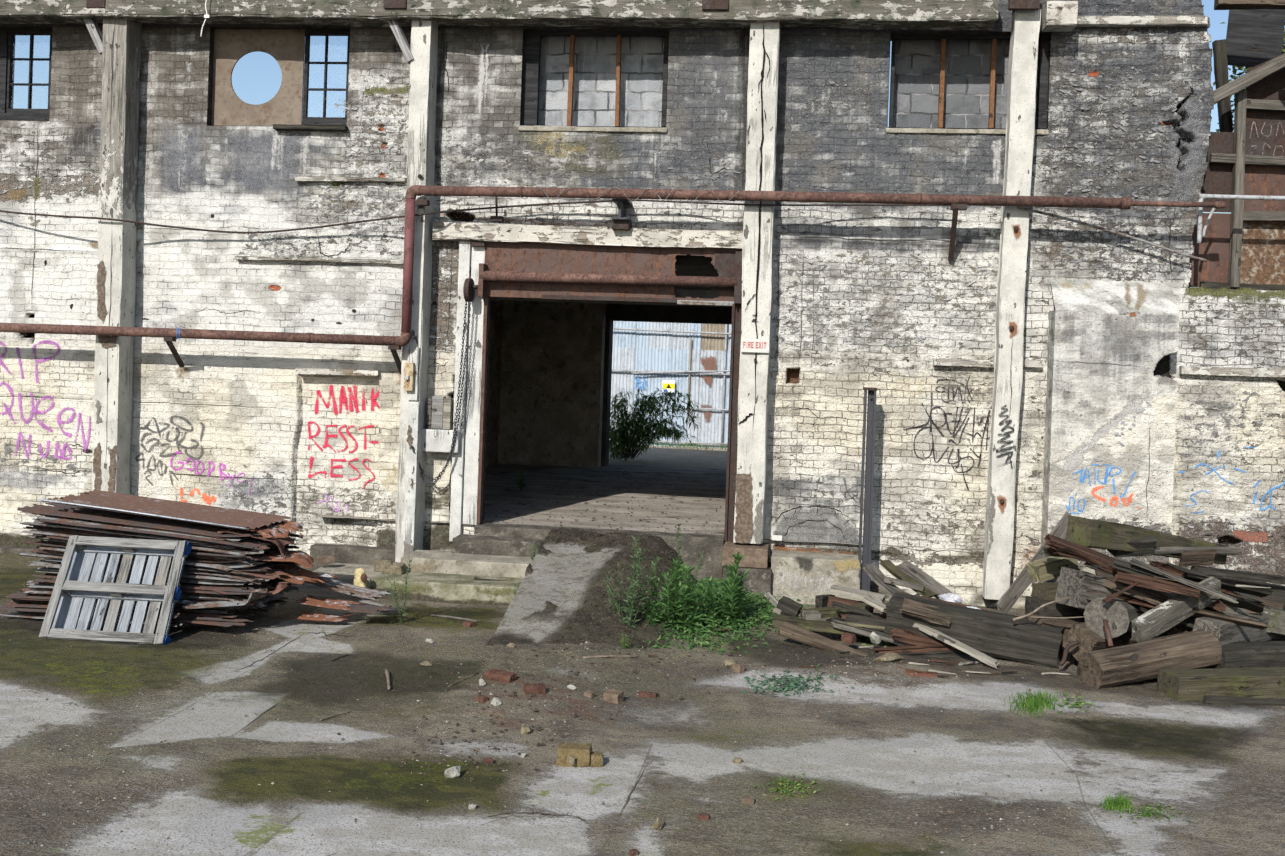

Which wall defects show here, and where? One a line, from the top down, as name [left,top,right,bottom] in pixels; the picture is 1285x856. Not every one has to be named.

leakage [226,134,309,190]
rust [1189,55,1285,287]
peeling [96,261,118,349]